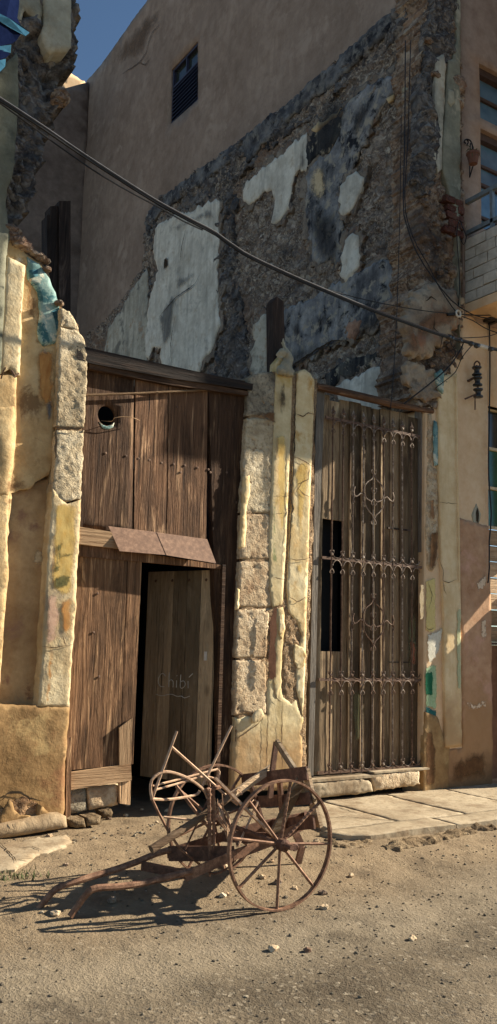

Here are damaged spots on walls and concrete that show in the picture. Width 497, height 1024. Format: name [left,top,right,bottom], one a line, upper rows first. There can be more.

peeling [432,54,455,174]
peeling [102,194,227,373]
peeling [240,64,396,410]
spalling [440,194,465,239]
spalling [278,607,307,700]
water stain [454,756,485,780]